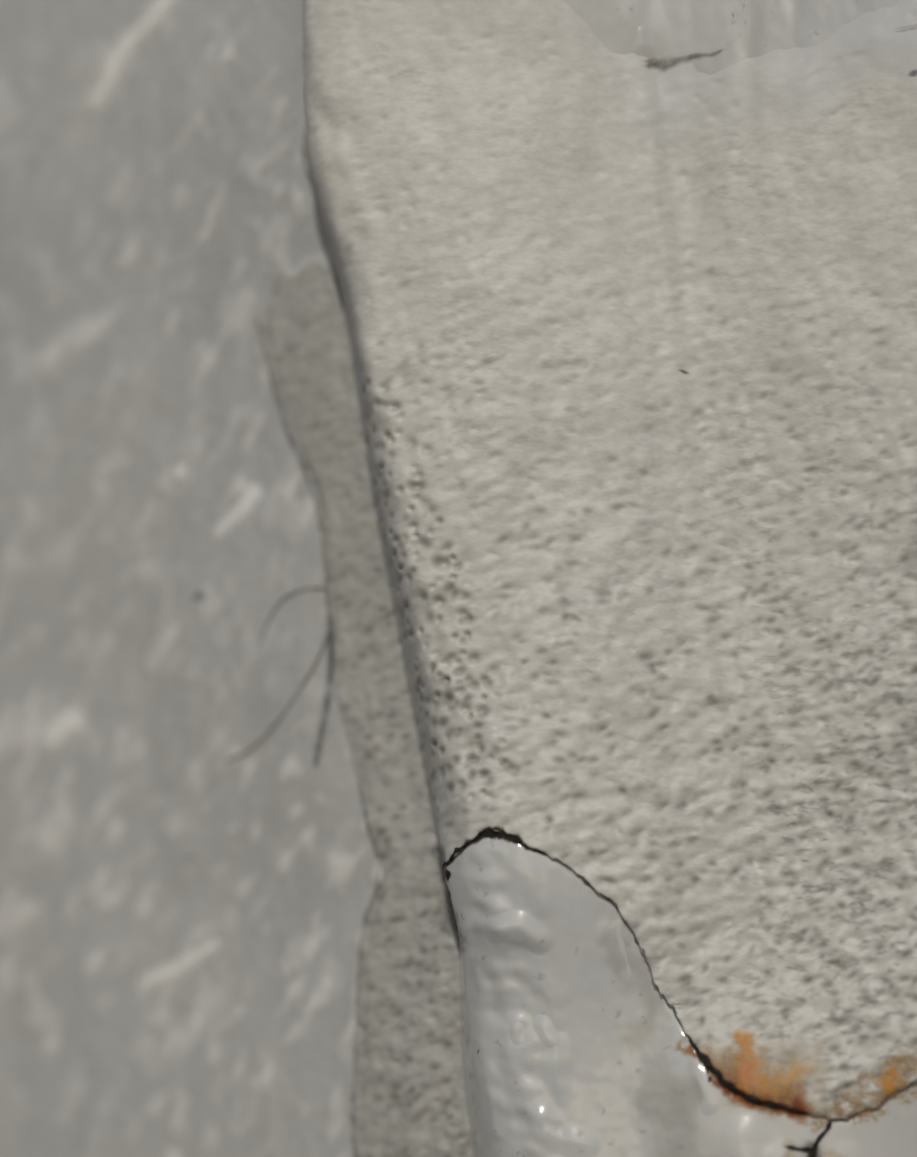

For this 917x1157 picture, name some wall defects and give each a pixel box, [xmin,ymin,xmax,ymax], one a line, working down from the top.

crack [442,826,917,1157]
rust [678,1031,917,1129]